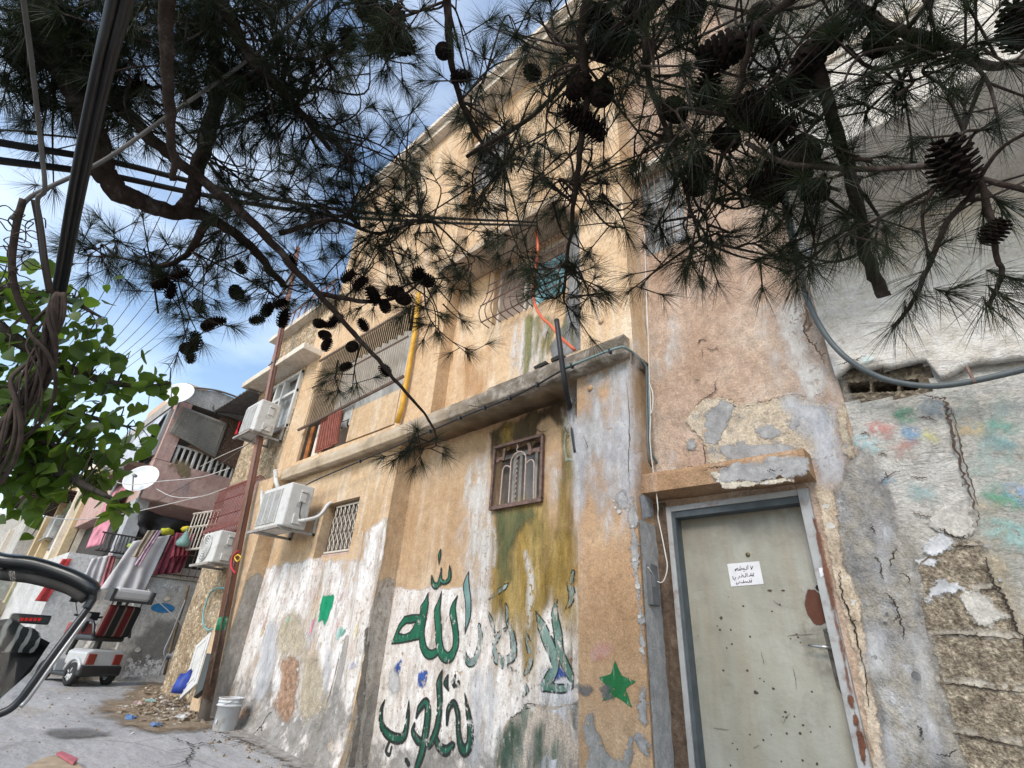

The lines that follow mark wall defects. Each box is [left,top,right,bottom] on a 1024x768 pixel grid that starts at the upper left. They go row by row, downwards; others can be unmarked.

damp [464,396,582,672]
flaking render [684,394,855,489]
crack [838,571,869,706]
crack [870,523,911,640]
crack [913,394,980,539]
flaking render [915,539,1024,768]
damp [366,738,496,768]
flaking render [495,685,651,768]